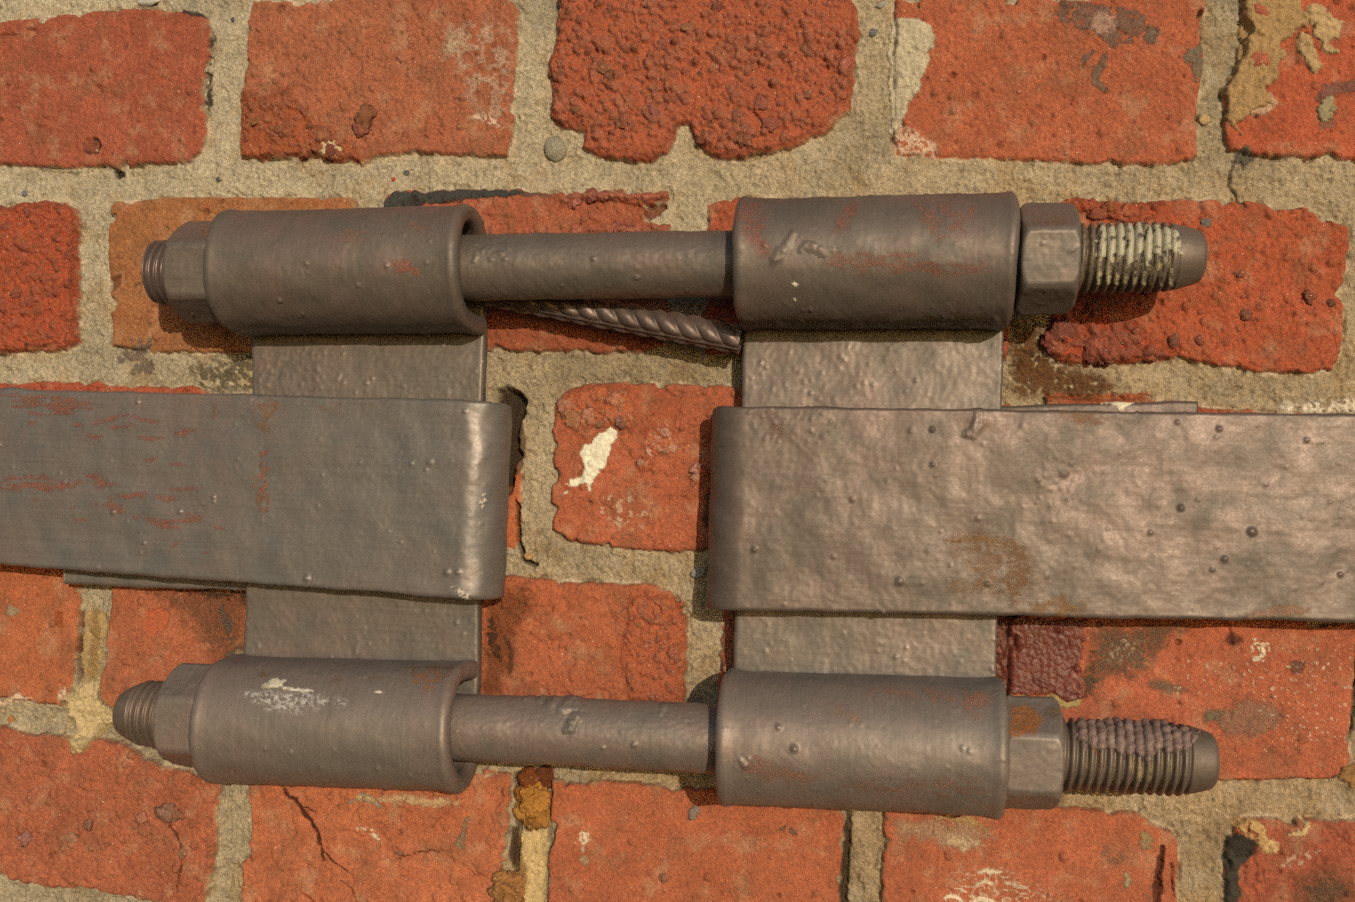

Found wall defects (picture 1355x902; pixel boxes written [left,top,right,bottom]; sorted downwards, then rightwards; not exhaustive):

peeling [1250,3,1344,74]
peeling [1250,92,1278,116]
spalling [1317,95,1337,121]
spalling [557,385,680,471]
spalling [688,463,710,483]
crack [169,824,182,889]
crack [282,785,354,894]
water stain [943,868,1045,902]
crack [1153,845,1174,902]